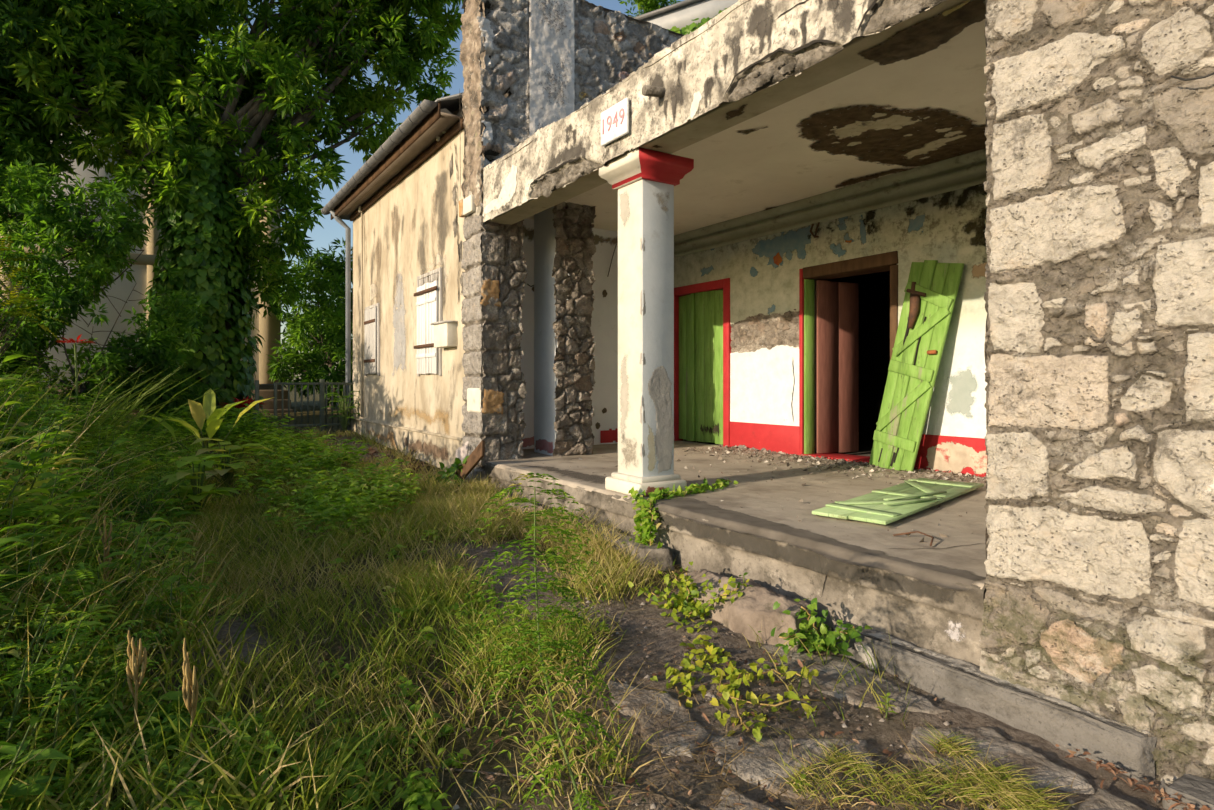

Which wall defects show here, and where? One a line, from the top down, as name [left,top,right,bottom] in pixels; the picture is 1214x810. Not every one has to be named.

spalling [728,0,986,102]
peeling [826,113,966,188]
spalling [531,160,605,198]
damp [358,173,447,325]
peeling [750,225,811,277]
peeling [830,215,866,257]
damp [395,402,451,433]
damp [404,438,448,460]
flaking render [639,353,674,497]